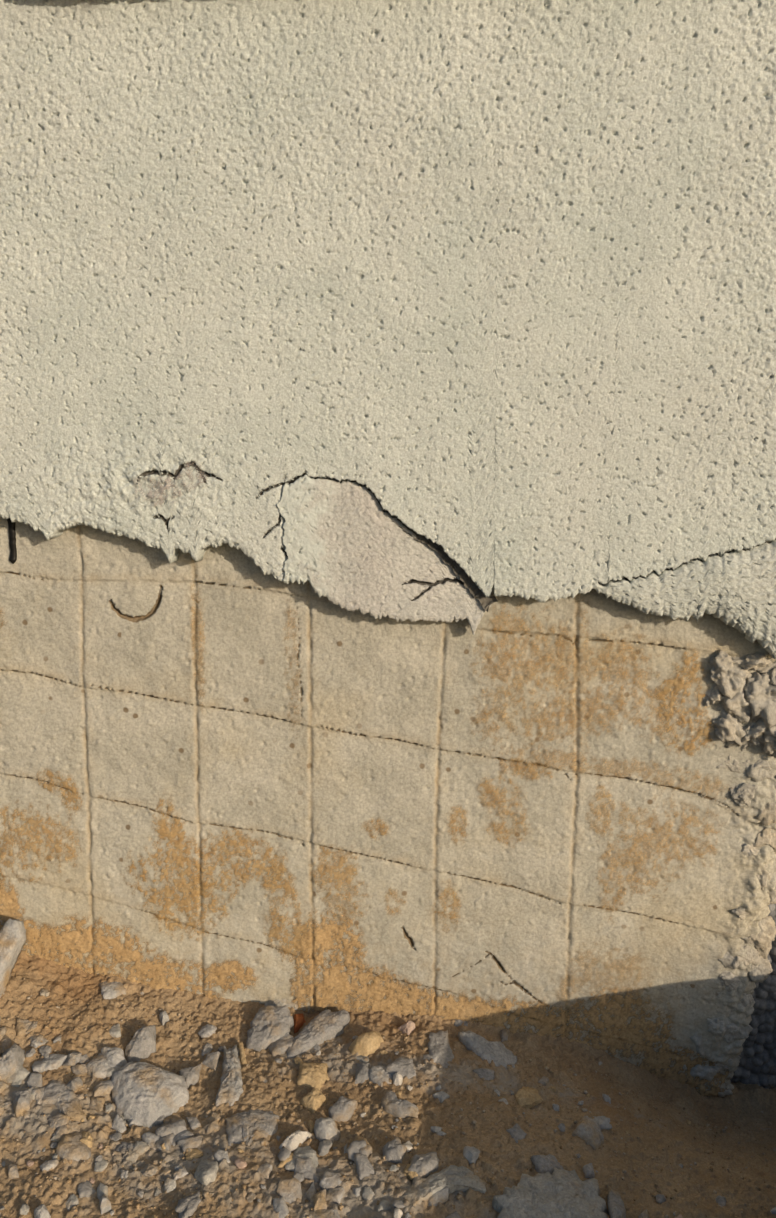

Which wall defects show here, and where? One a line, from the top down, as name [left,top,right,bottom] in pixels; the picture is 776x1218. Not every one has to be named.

crack [137,462,223,483]
crack [155,515,173,532]
peeling [276,474,491,635]
crack [256,473,685,649]
crack [622,538,776,581]
spalling [109,584,163,623]
spalling [683,650,776,1097]